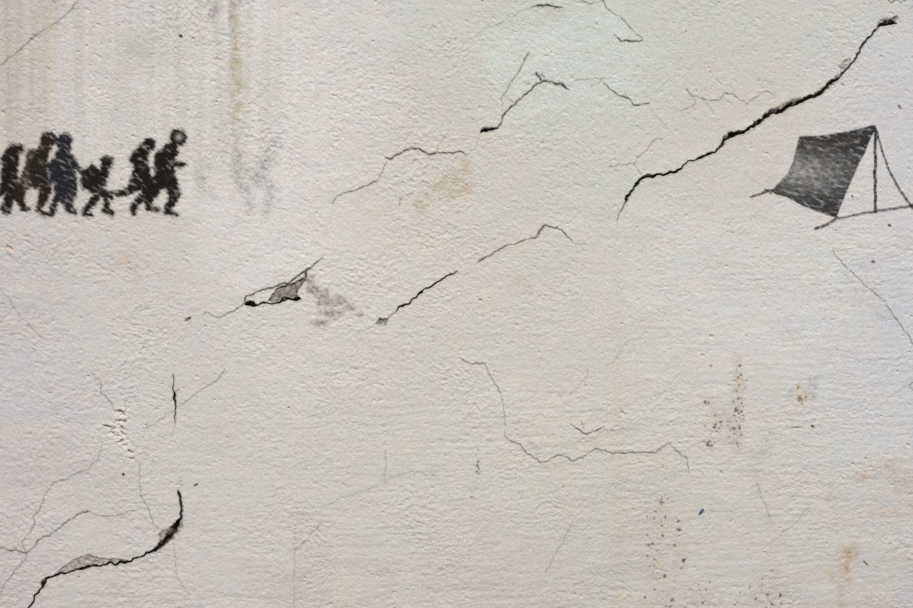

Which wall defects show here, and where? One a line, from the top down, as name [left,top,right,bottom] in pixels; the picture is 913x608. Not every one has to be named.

crack [330,0,913,222]
spalling [183,256,324,322]
crack [386,223,587,320]
crack [90,370,137,409]
crack [143,368,226,439]
crack [0,442,191,608]